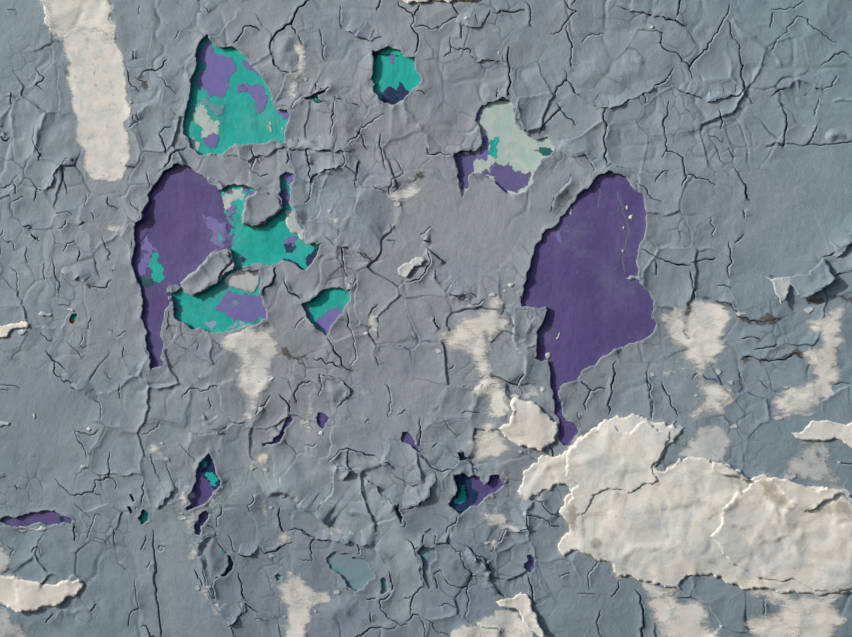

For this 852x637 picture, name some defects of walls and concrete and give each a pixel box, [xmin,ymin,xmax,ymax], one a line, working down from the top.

crack [0,125,143,308]
peeling [128,31,377,372]
crack [232,0,405,204]
peeling [368,43,425,108]
peeling [450,94,660,449]
crack [375,0,852,390]
peeling [0,507,75,533]
crack [40,317,165,637]
peeling [124,451,258,637]
crack [179,236,559,637]
peeling [446,448,507,518]
crack [559,560,646,637]